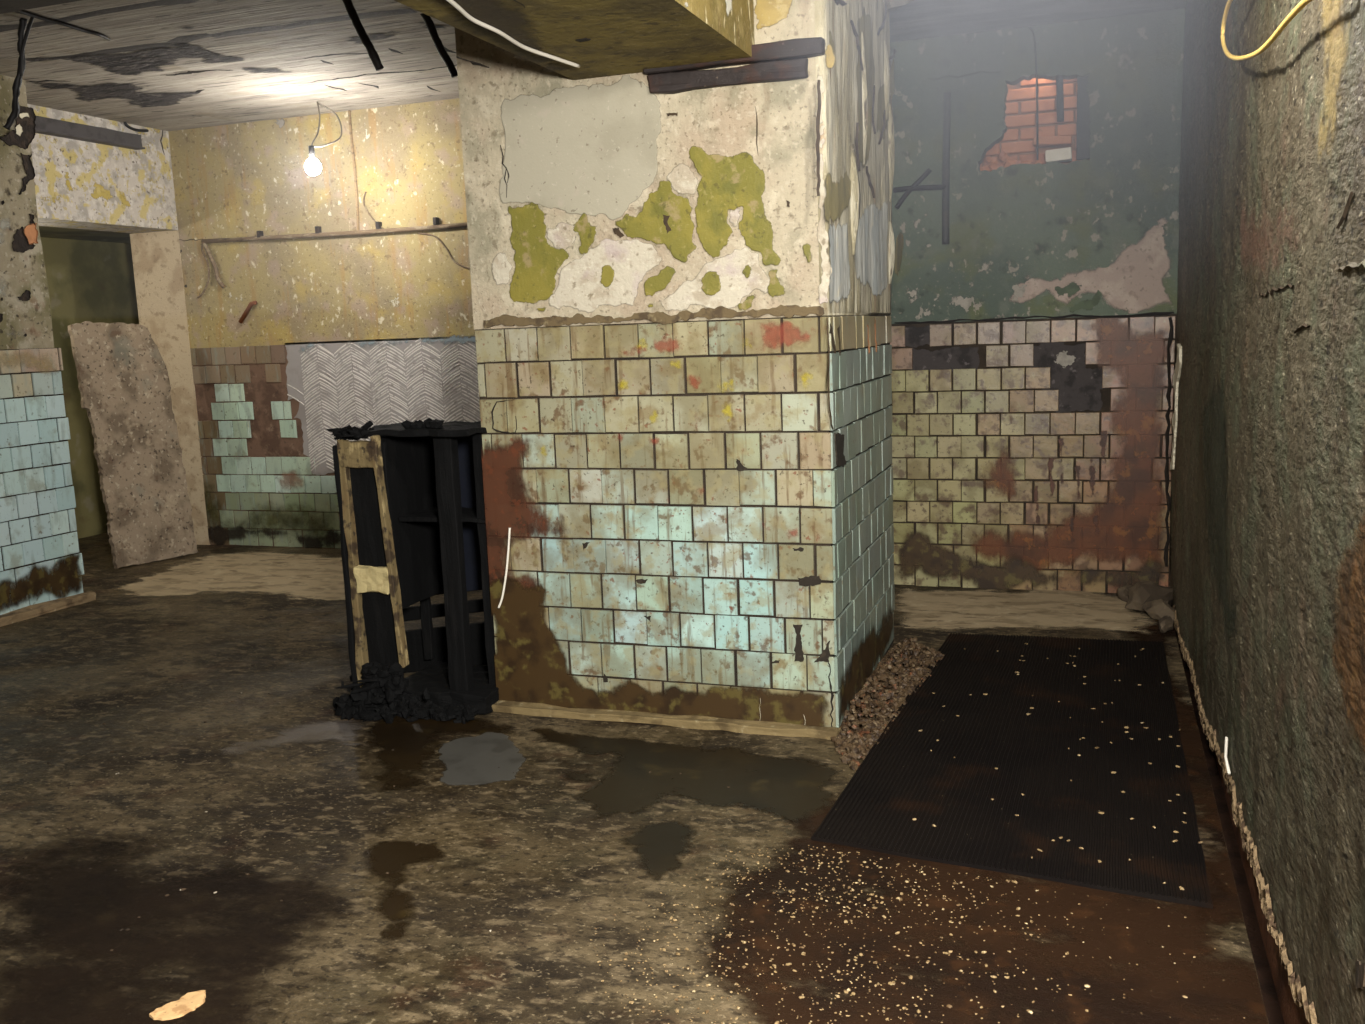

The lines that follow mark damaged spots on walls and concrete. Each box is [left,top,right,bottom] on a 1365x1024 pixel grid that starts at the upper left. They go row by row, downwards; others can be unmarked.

spalling [0,106,36,195]
spalling [0,164,75,253]
peeling [483,8,927,328]
spalling [0,287,31,322]
peeling [903,288,980,371]
peeling [1011,218,1170,314]
peeling [1029,337,1103,413]
corrosion [973,318,1171,572]
corrosion [481,438,564,589]
damp [0,554,82,611]
damp [118,552,345,600]
damp [490,532,1176,727]